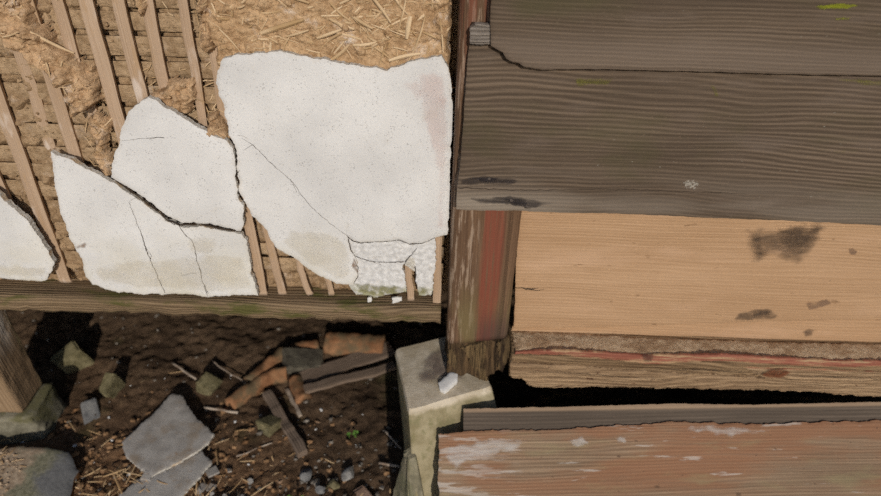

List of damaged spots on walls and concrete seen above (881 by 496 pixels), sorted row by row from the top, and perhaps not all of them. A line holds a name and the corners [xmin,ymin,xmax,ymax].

spalling [0,0,116,176]
spalling [127,0,148,17]
spalling [143,65,231,139]
spalling [192,0,455,99]
crack [112,135,434,296]
peeling [349,238,437,303]